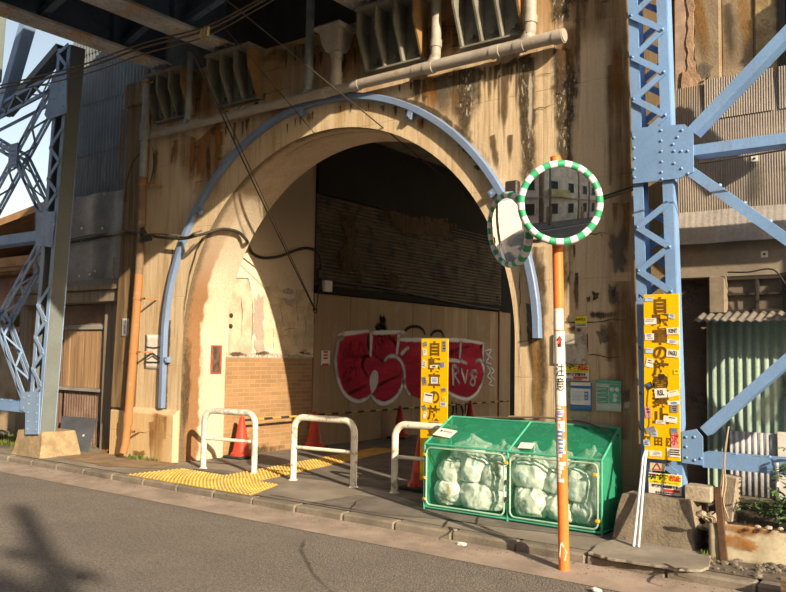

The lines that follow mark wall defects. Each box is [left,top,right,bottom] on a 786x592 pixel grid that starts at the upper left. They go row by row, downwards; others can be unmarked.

rust [173,123,223,181]
water stain [394,53,536,179]
water stain [552,0,583,161]
peeling [228,278,314,357]
rust [726,525,771,551]